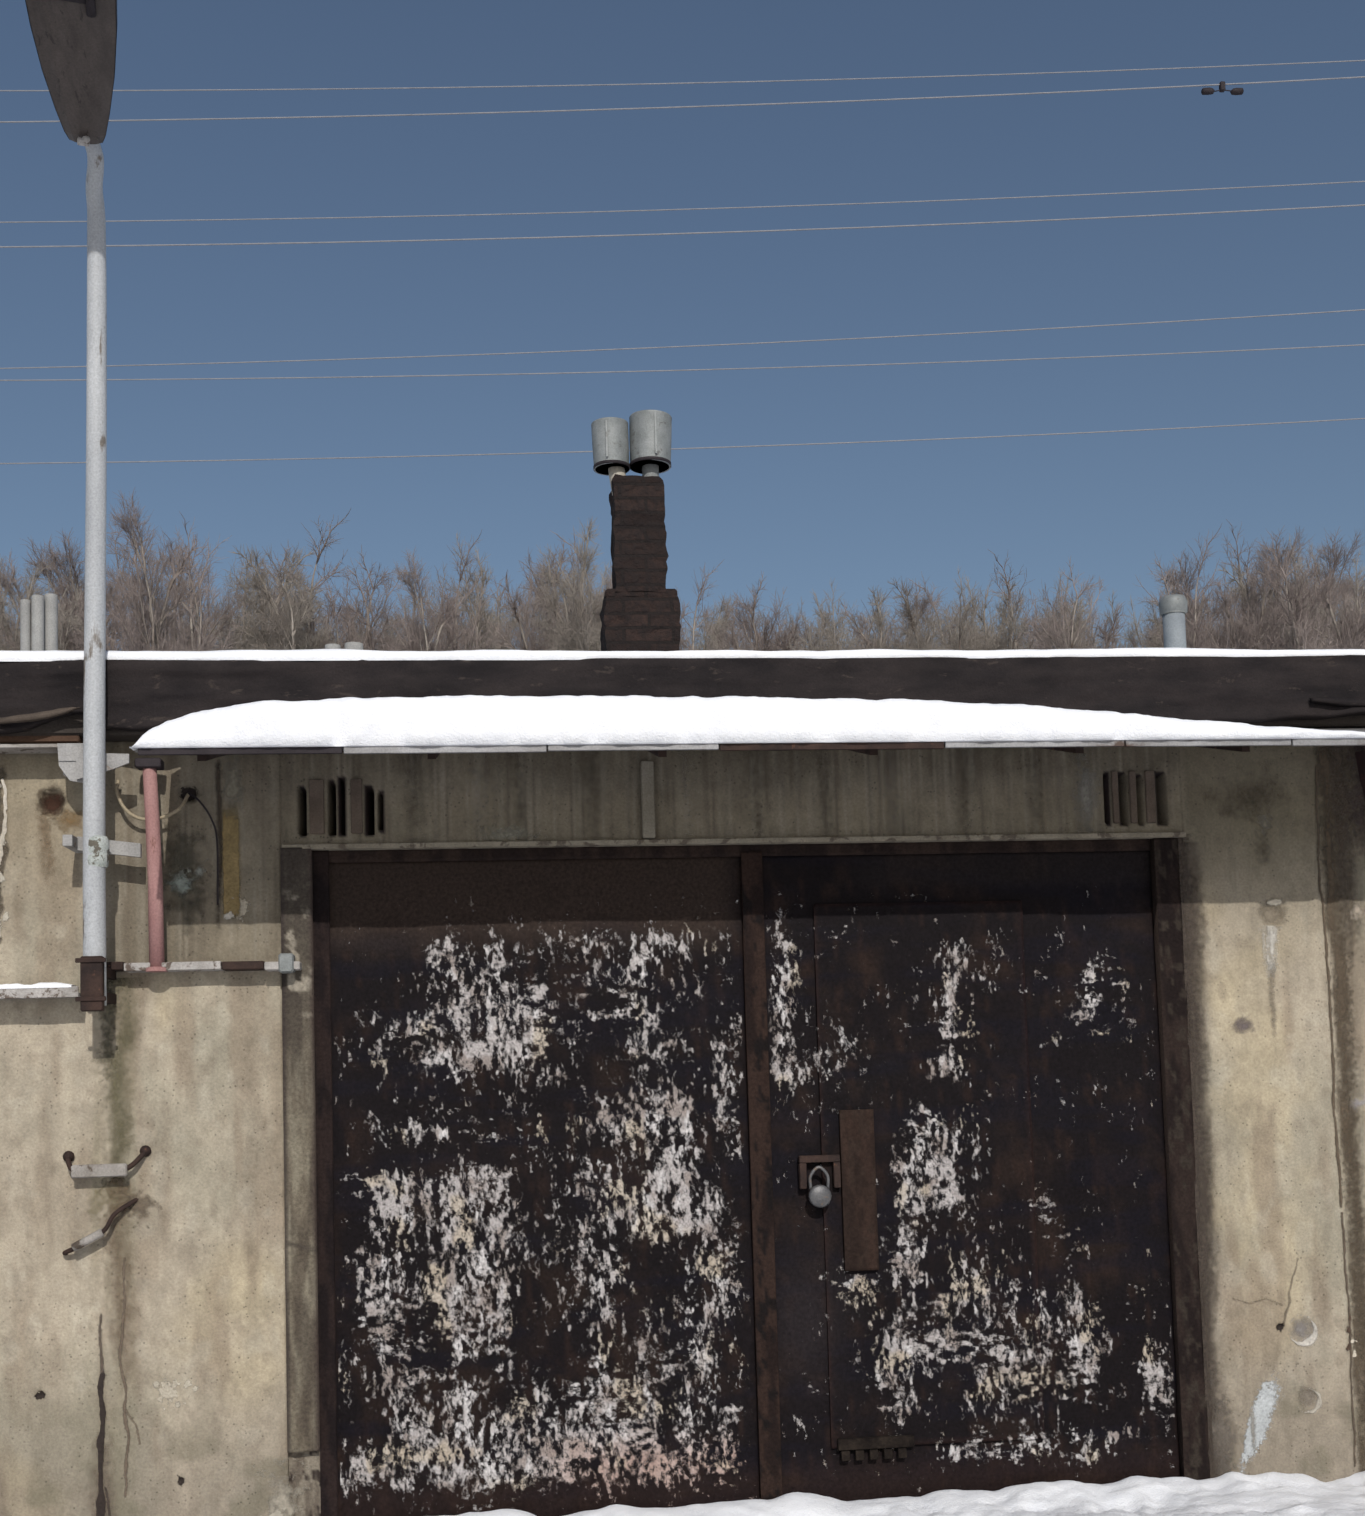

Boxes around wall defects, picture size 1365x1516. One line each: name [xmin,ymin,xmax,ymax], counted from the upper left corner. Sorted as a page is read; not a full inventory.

leakage [1326,746,1365,953]
peeling [767,894,868,1096]
peeling [916,931,1003,1086]
peeling [1071,955,1142,1035]
peeling [335,920,749,1510]
peeling [819,1104,1175,1477]
leakage [1178,837,1236,1478]
crack [1245,1260,1298,1332]